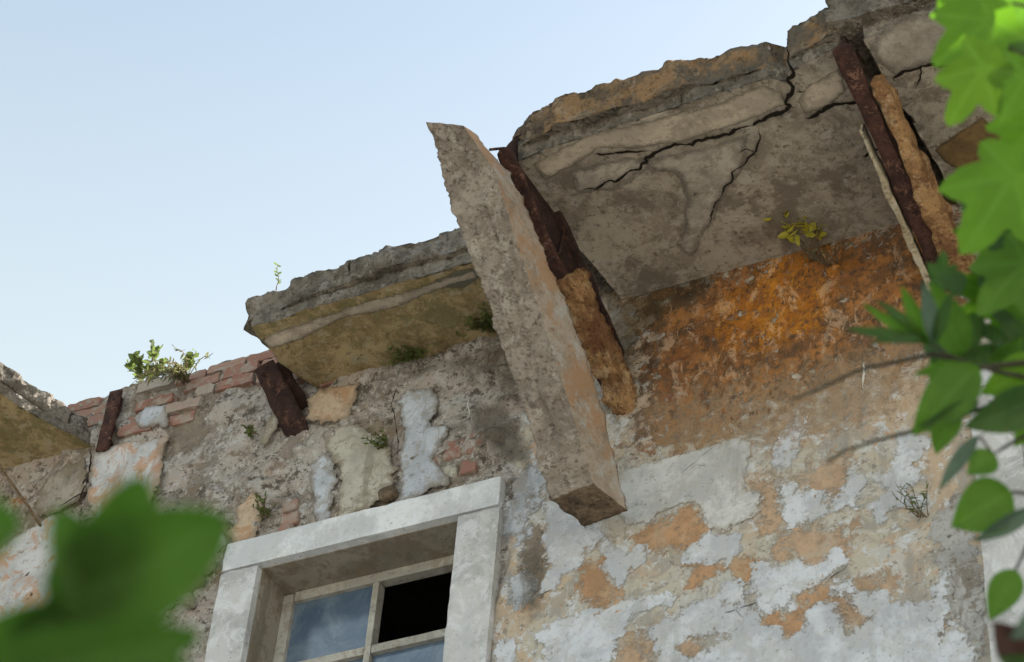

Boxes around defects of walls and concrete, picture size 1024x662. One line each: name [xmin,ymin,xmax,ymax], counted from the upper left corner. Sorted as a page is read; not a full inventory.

crack [575,44,856,233]
spalling [161,406,211,461]
rust [614,224,929,462]
peeling [503,410,987,662]
peeling [491,637,517,662]